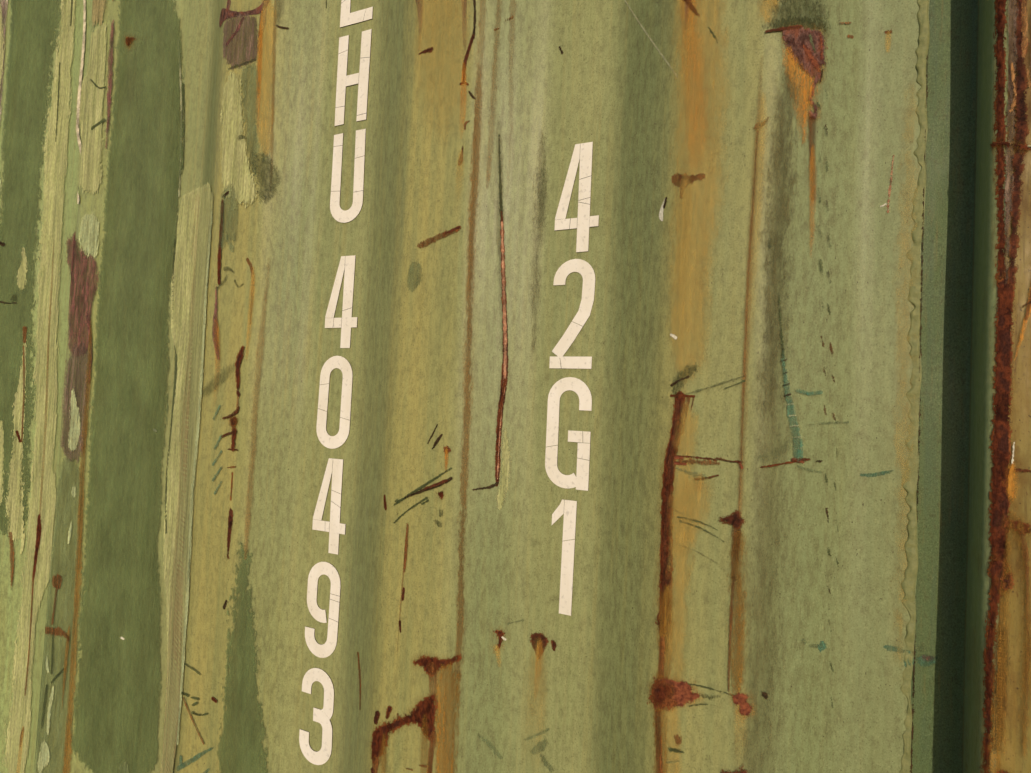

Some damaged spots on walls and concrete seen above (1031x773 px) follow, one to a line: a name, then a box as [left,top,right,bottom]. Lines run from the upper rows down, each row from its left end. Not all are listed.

peeling [219,0,270,243]
rust [742,205,754,422]
rust [979,0,1031,773]
rust [647,391,753,773]
rust [370,654,462,773]